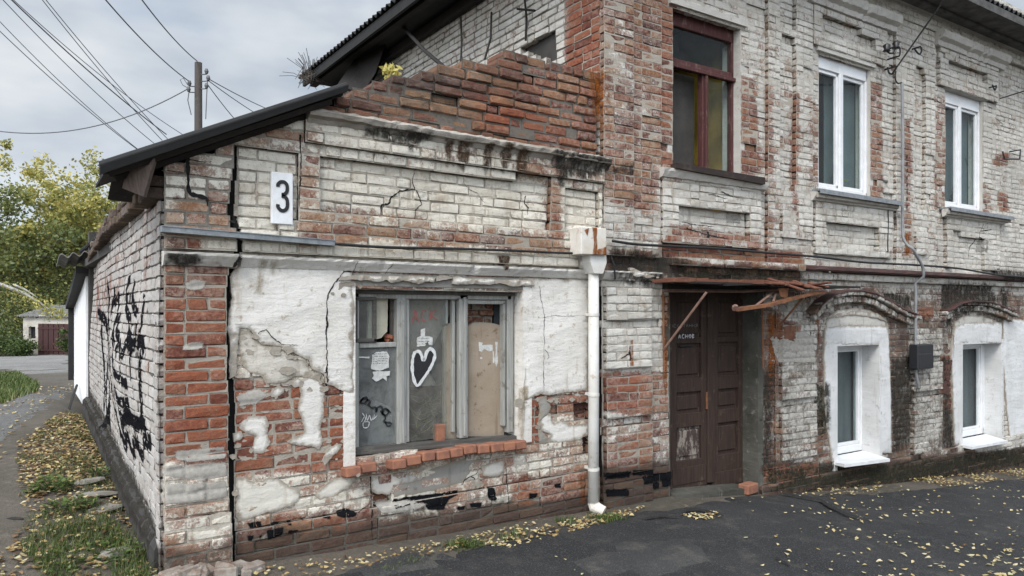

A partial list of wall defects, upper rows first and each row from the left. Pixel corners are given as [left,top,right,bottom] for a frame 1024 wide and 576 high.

corrosion [590,71,609,122]
leakage [365,127,431,149]
leakage [445,139,473,169]
leakage [483,142,531,178]
crack [380,170,425,215]
peeling [186,279,206,290]
crack [167,146,242,562]
crack [320,262,392,401]
peeling [771,324,816,363]
peeling [157,335,504,521]
peeling [514,392,588,454]
leakage [762,356,1024,492]